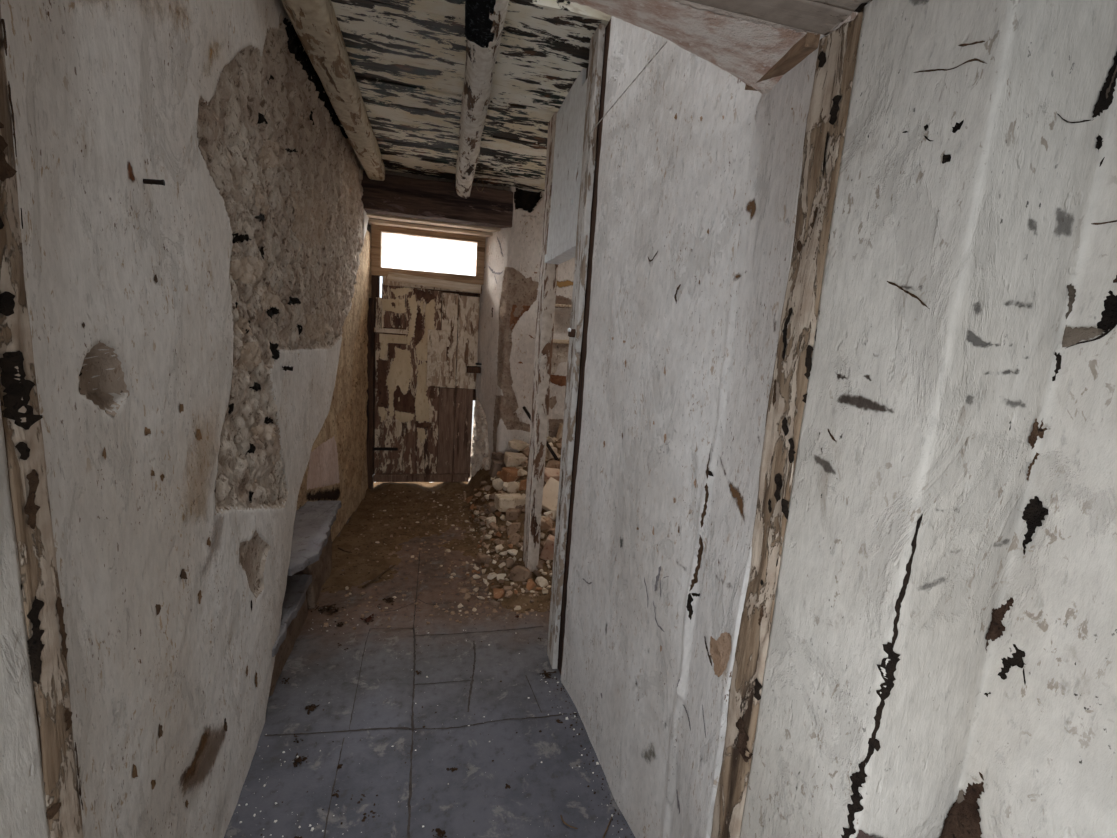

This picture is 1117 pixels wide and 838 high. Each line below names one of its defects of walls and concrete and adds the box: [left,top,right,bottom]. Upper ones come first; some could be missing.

peeling [568,0,817,92]
spalling [197,13,436,515]
damp [887,281,928,308]
spalling [79,342,130,417]
spalling [468,267,539,482]
damp [838,395,892,413]
damp [815,456,835,474]
crack [841,514,923,838]
spalling [985,597,1026,684]
spalling [939,772,984,838]